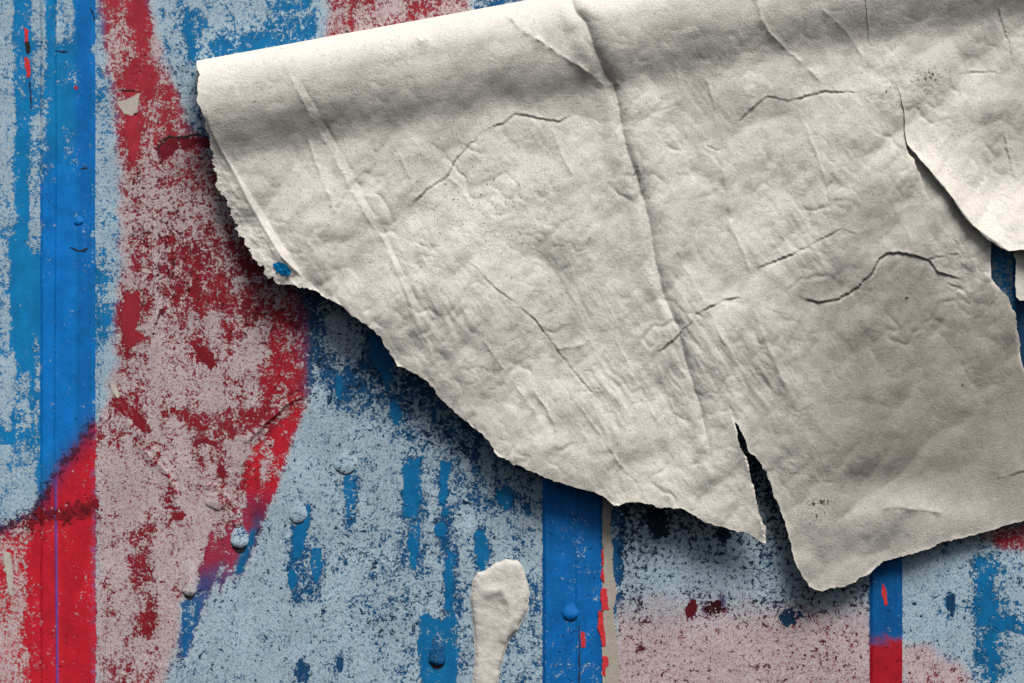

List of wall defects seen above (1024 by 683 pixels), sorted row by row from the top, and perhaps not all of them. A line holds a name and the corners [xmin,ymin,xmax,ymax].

peeling [177,2,323,69]
peeling [176,218,258,318]
peeling [193,342,219,369]
peeling [367,330,403,426]
peeling [288,503,323,590]
peeling [339,471,357,520]
peeling [401,455,423,573]
peeling [416,460,461,683]
peeling [474,530,489,571]
peeling [496,485,515,511]
peeling [646,507,672,539]
peeling [715,527,732,543]